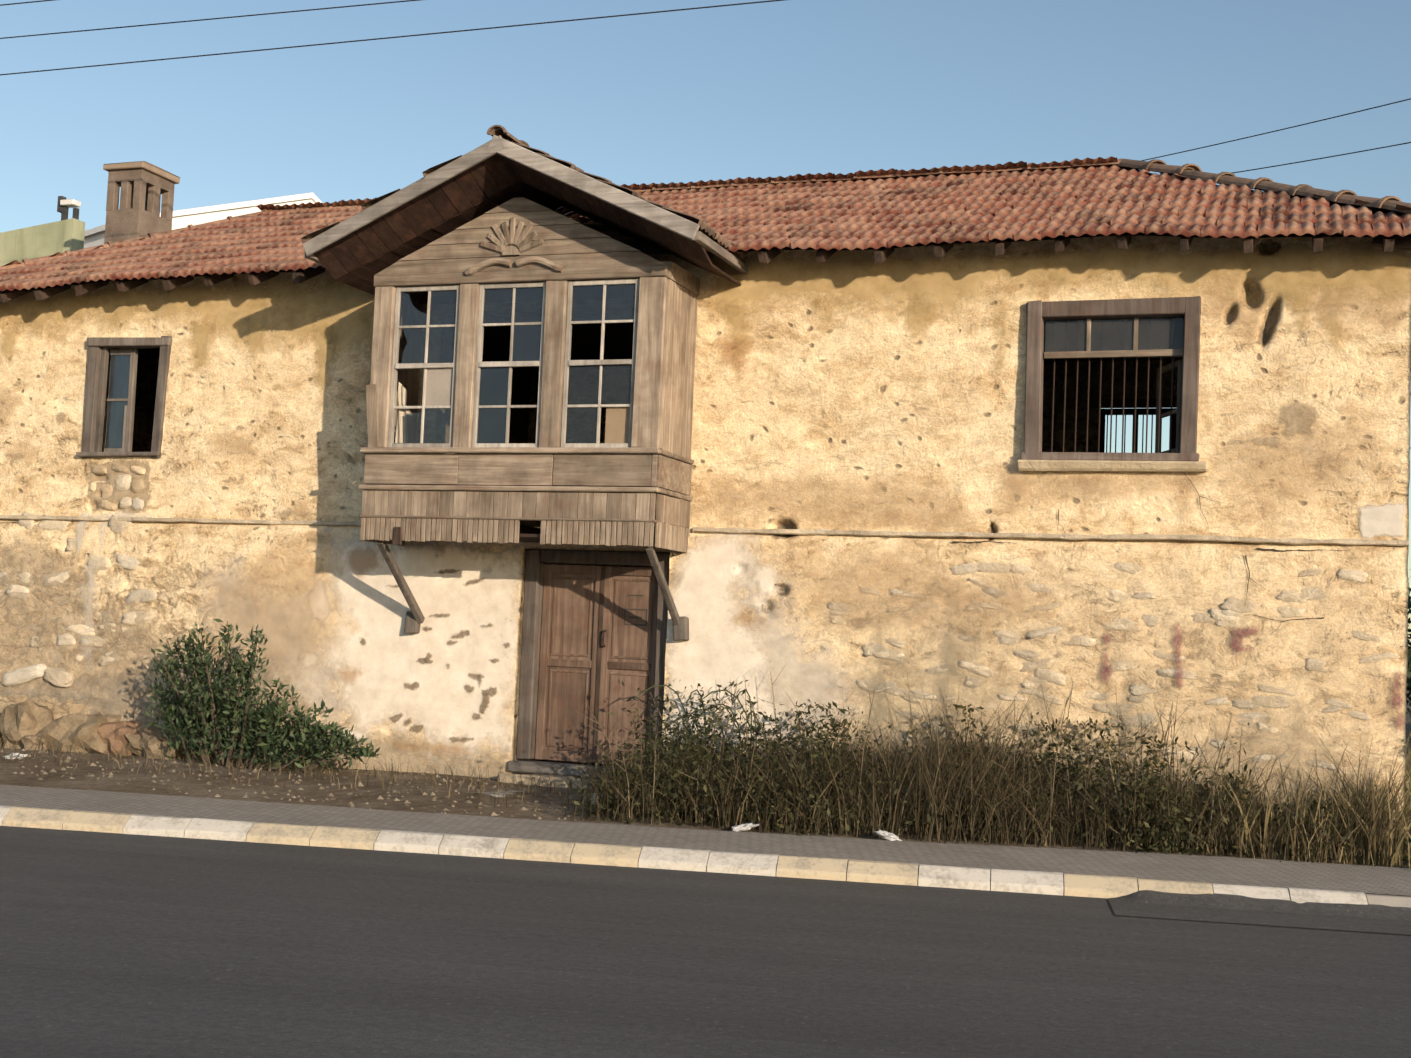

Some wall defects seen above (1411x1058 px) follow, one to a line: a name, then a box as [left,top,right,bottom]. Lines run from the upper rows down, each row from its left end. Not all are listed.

spalling [1224,281,1282,345]
spalling [88,458,150,534]
flaking render [0,570,70,599]
crack [1244,548,1344,635]
flaking render [1275,568,1369,618]
flaking render [2,589,158,688]
peeling [216,577,337,715]
spalling [390,714,423,732]
spalling [465,673,497,719]
peeling [744,567,994,744]
flaking render [949,562,1159,705]
flaking render [1084,650,1197,730]